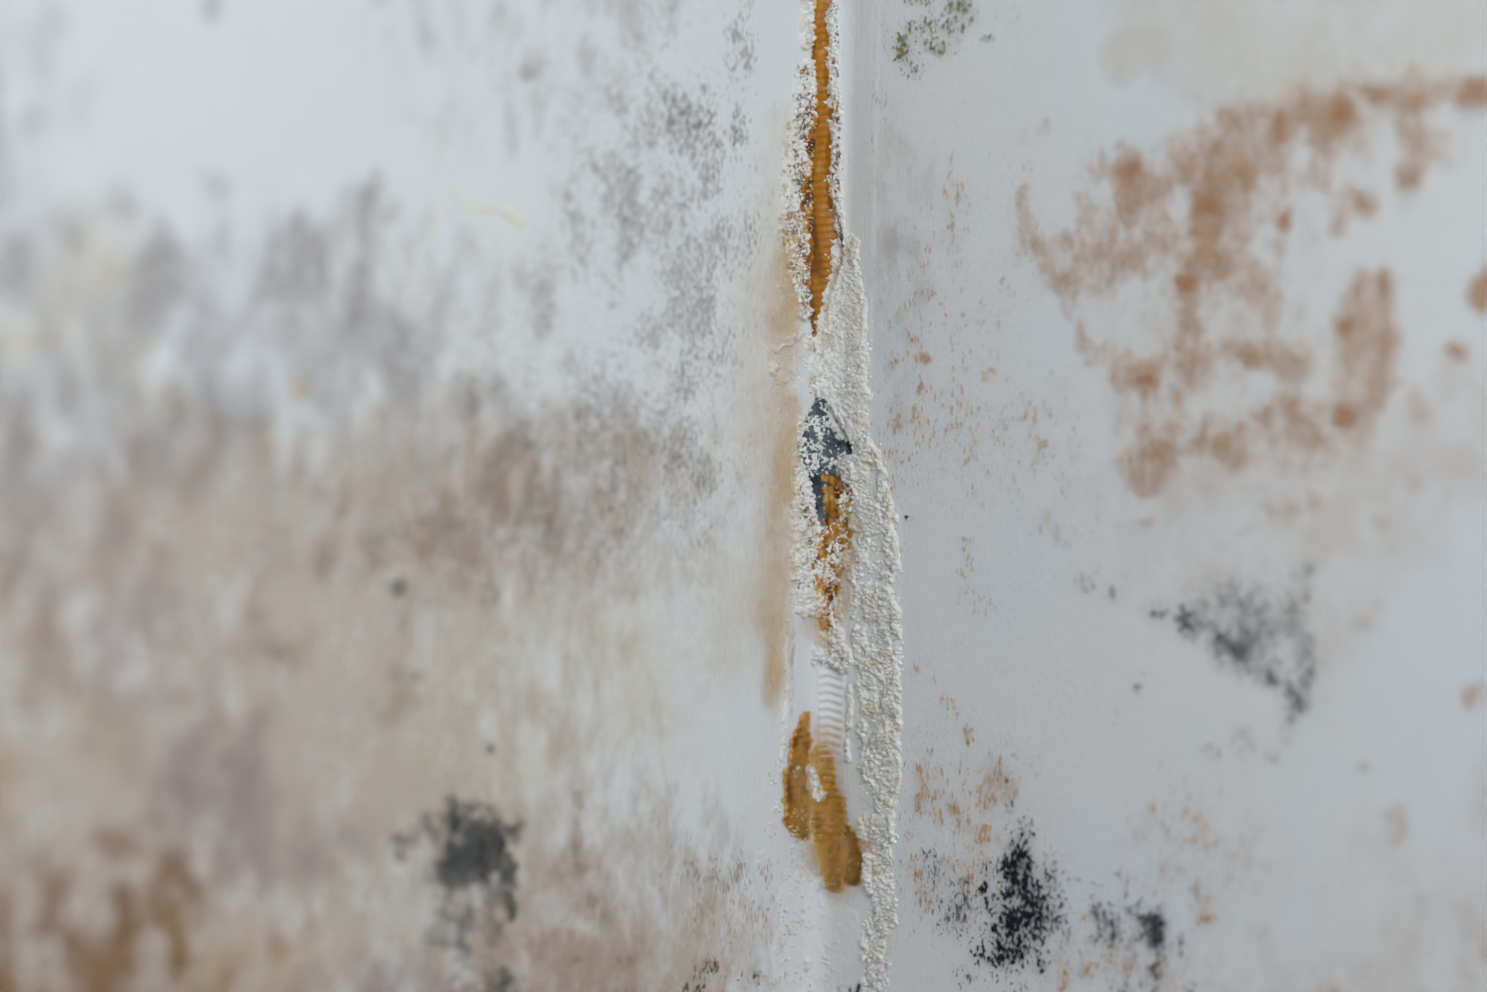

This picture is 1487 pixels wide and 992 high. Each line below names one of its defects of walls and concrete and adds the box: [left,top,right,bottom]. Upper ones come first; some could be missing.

mould [891,0,996,80]
crack [808,0,838,358]
mould [1149,564,1318,723]
damp [70,887,186,992]
mould [392,793,524,992]
mould [683,959,760,992]
mould [915,779,1186,992]